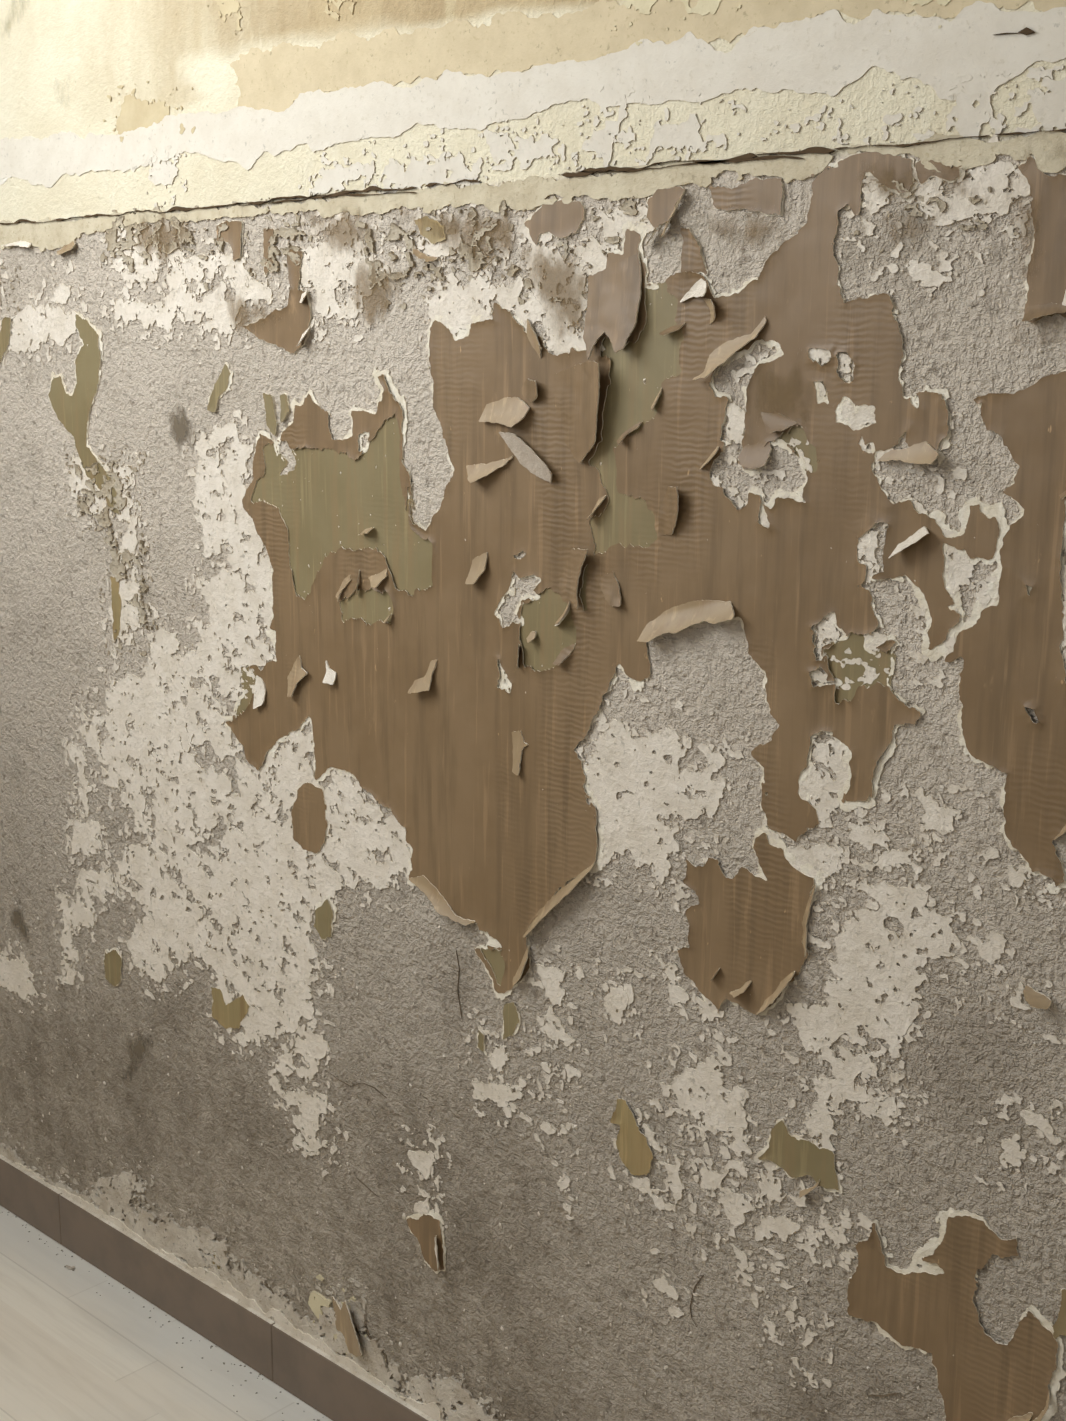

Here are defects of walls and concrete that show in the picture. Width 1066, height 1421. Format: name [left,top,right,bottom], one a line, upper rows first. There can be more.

crack [561,128,1066,177]
crack [0,179,481,225]
flaking render [870,240,990,297]
peeling [207,362,234,413]
flaking render [915,784,968,866]
flaking render [0,939,48,1014]
flaking render [600,966,648,1025]
peeling [610,1094,697,1214]
flaking render [974,1092,1066,1191]
spalling [0,1124,512,1421]
flaking render [638,1248,699,1323]
flaking render [771,1297,835,1347]